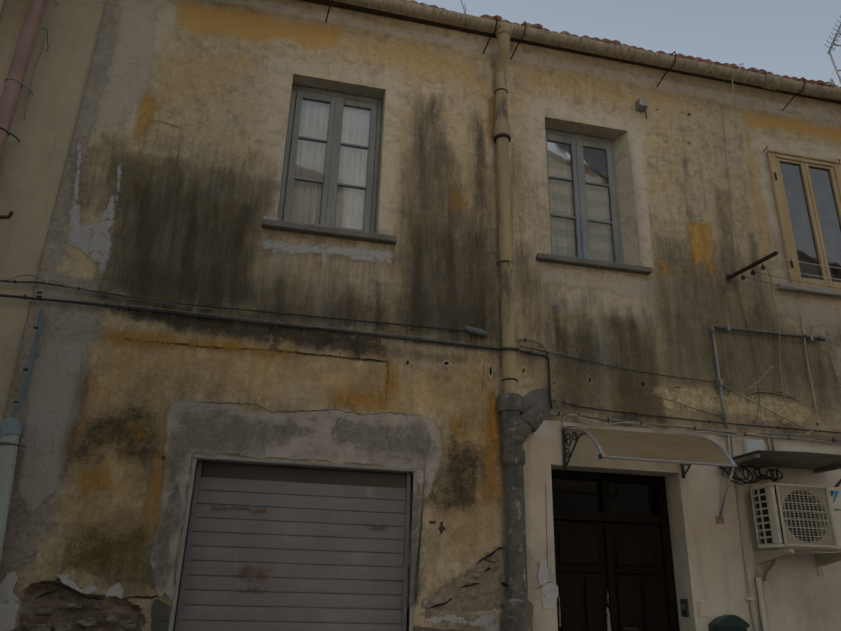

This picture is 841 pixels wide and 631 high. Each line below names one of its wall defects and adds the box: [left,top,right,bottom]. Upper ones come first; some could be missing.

peeling [68,143,123,274]
peeling [261,238,394,264]
damp [67,405,309,587]
damp [404,440,484,605]
spalling [0,571,159,631]
flaking render [421,544,508,631]
peeling [536,558,561,626]